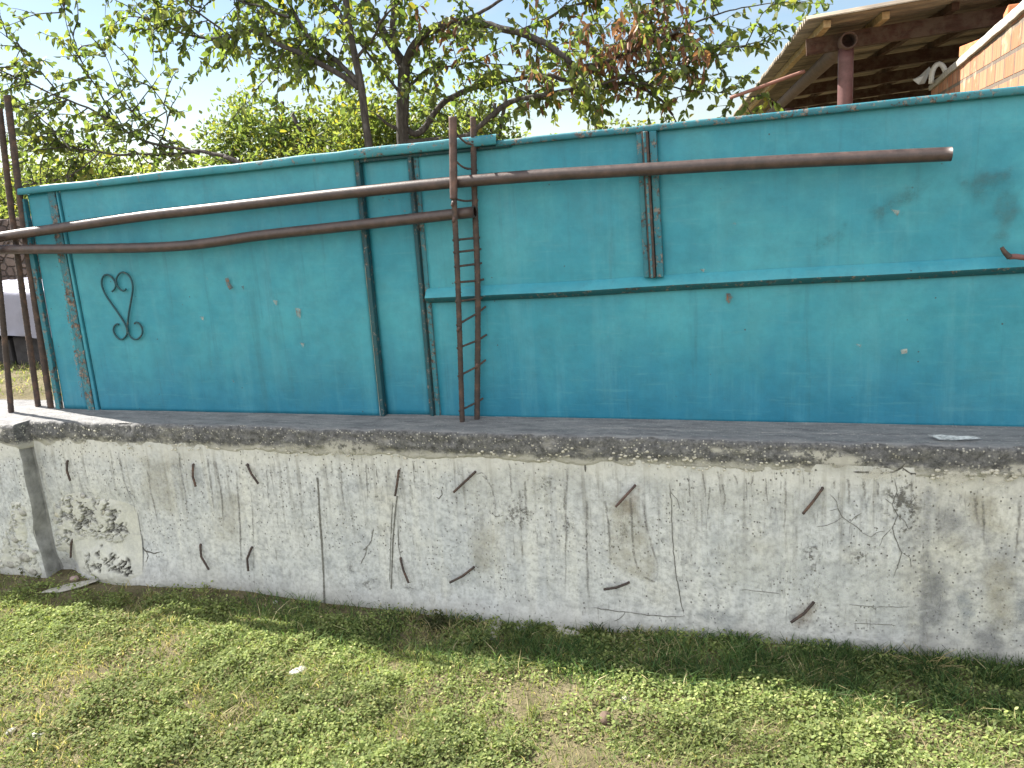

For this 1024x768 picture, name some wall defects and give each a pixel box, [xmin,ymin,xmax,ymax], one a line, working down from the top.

rust [61,273,91,402]
spalling [53,460,141,568]
crack [817,464,916,578]